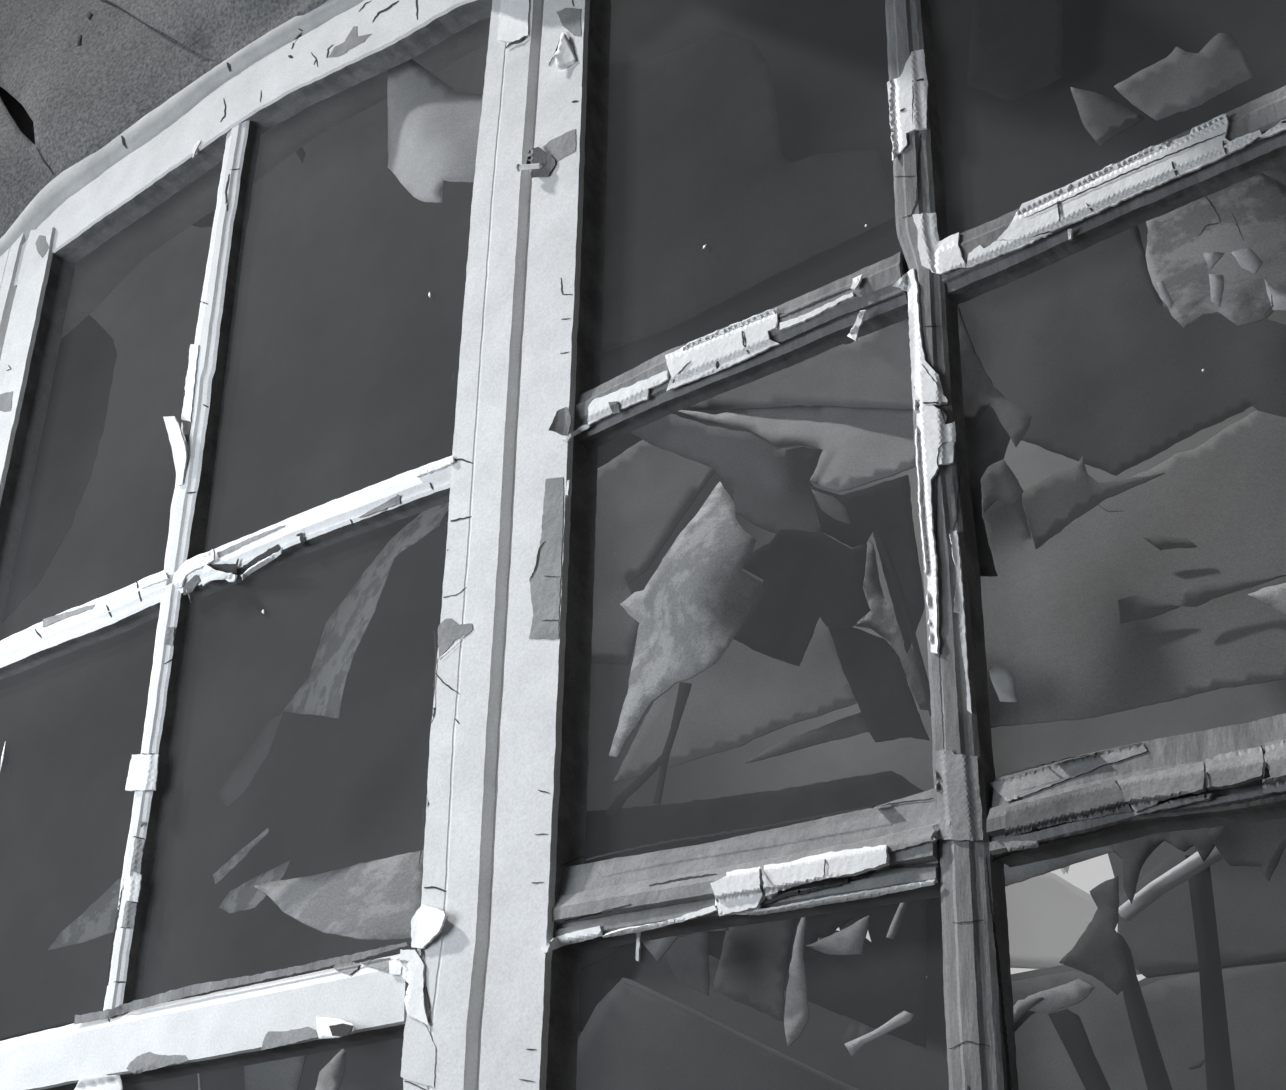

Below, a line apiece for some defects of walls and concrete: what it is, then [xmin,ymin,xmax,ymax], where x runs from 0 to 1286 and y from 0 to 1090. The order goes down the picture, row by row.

peeling [0,0,327,239]
peeling [328,26,371,57]
peeling [387,59,483,203]
peeling [497,0,530,49]
peeling [526,129,576,178]
peeling [601,30,928,354]
peeling [1070,33,1256,146]
peeling [0,391,13,412]
peeling [163,344,200,486]
peeling [414,456,455,478]
peeling [529,477,570,640]
peeling [541,114,1286,1048]